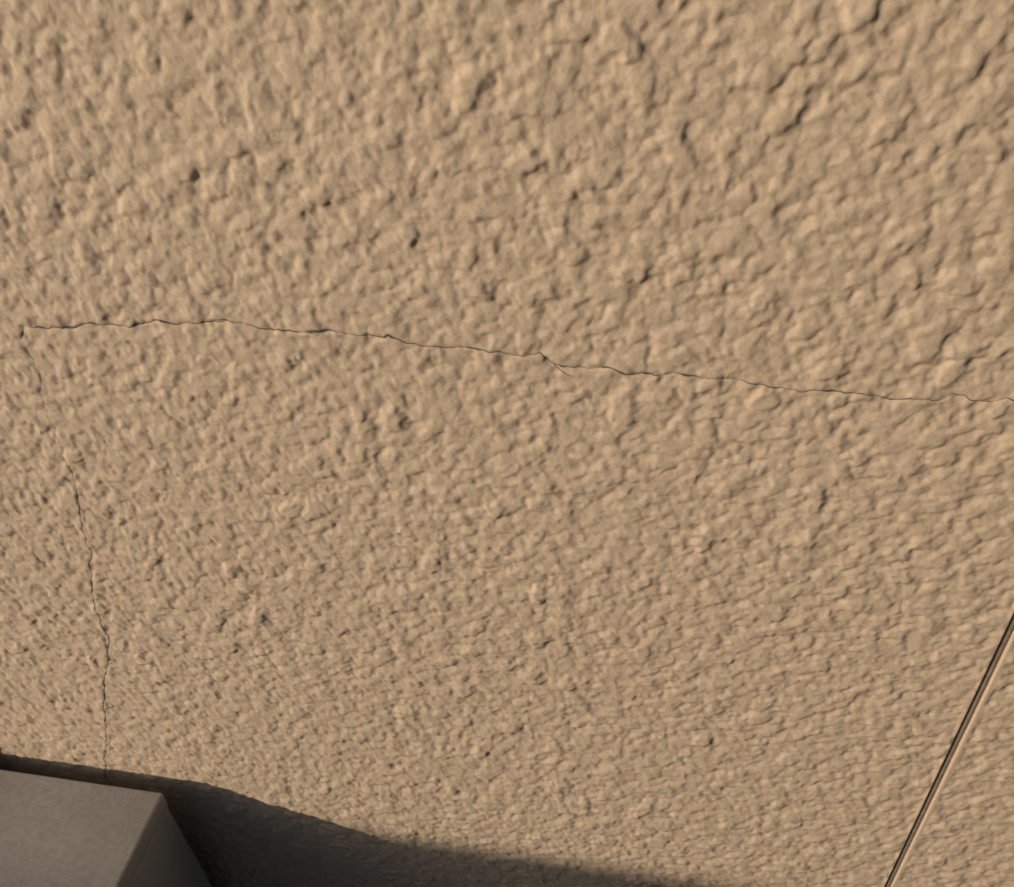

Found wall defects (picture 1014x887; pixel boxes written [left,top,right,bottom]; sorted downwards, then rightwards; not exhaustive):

crack [21,319,1014,781]